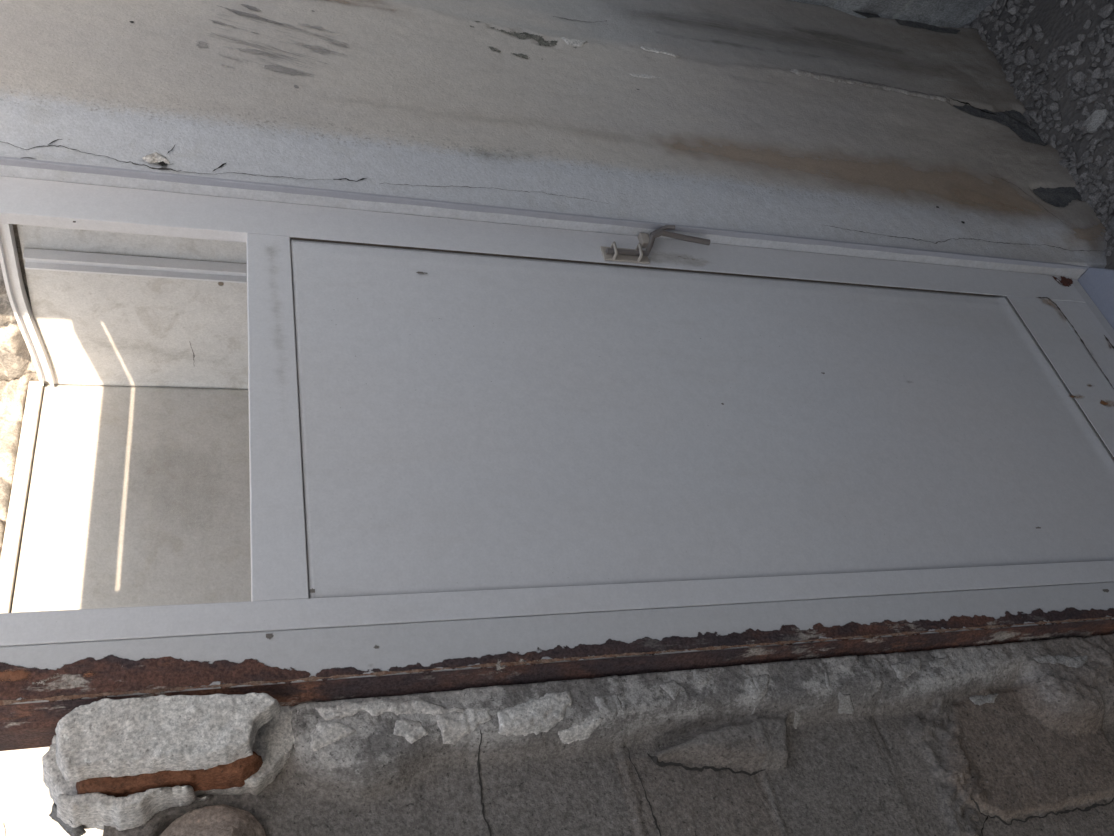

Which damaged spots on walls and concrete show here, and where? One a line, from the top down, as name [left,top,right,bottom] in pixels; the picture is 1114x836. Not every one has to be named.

damp [212,4,281,28]
spalling [471,21,587,48]
spalling [950,98,1047,146]
crack [0,139,608,204]
spalling [1033,187,1082,207]
rust [1052,276,1073,287]
rust [0,607,1114,751]